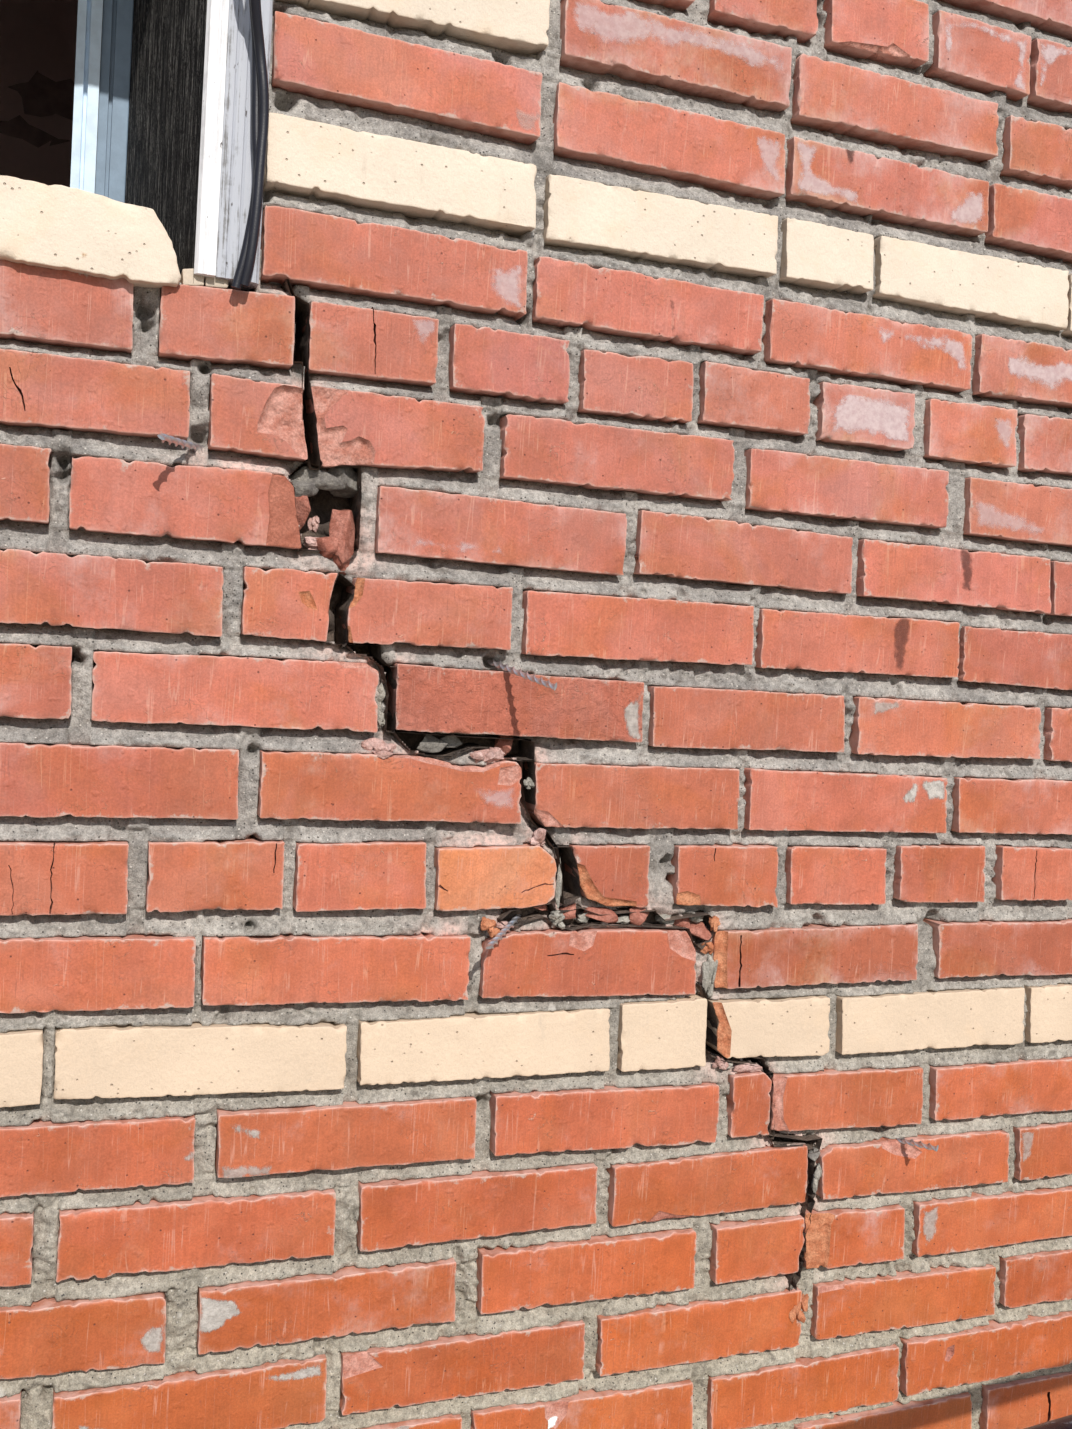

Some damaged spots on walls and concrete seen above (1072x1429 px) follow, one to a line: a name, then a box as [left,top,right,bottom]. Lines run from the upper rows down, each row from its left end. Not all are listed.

crack [281,279,823,1324]
spalling [577,863,637,907]
spalling [676,891,701,906]
spalling [569,931,597,951]